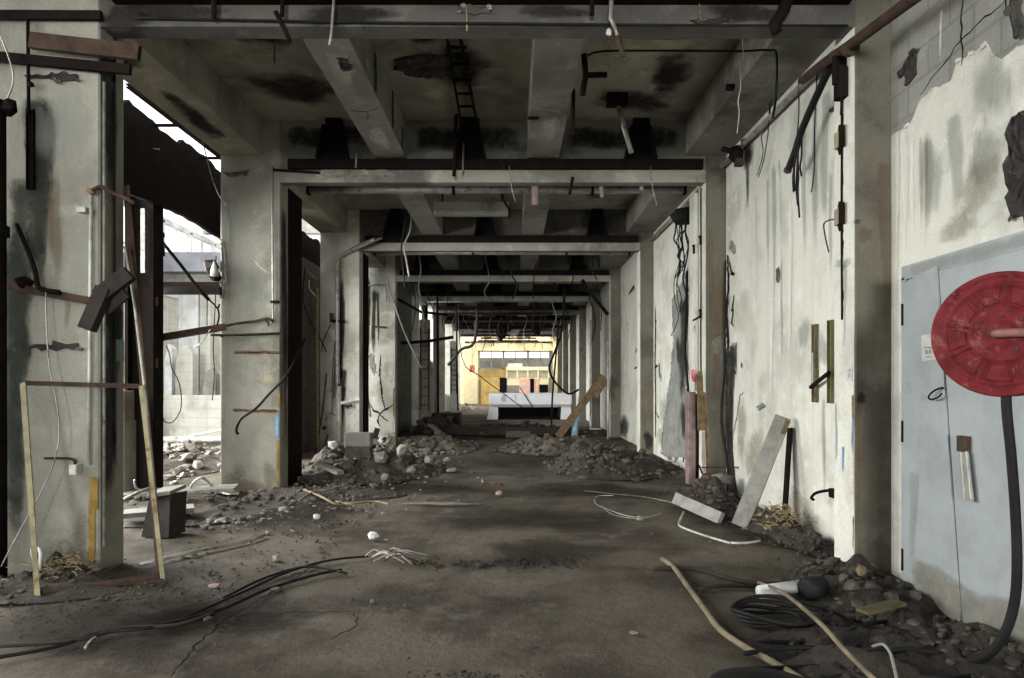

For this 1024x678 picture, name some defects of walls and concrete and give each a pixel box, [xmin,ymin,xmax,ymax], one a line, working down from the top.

spalling [24,71,80,84]
flaking render [891,0,1024,136]
water stain [947,161,996,237]
water stain [7,101,54,525]
spalling [27,340,83,351]
crack [370,355,392,426]
flaking render [660,267,688,462]
crack [170,557,359,677]